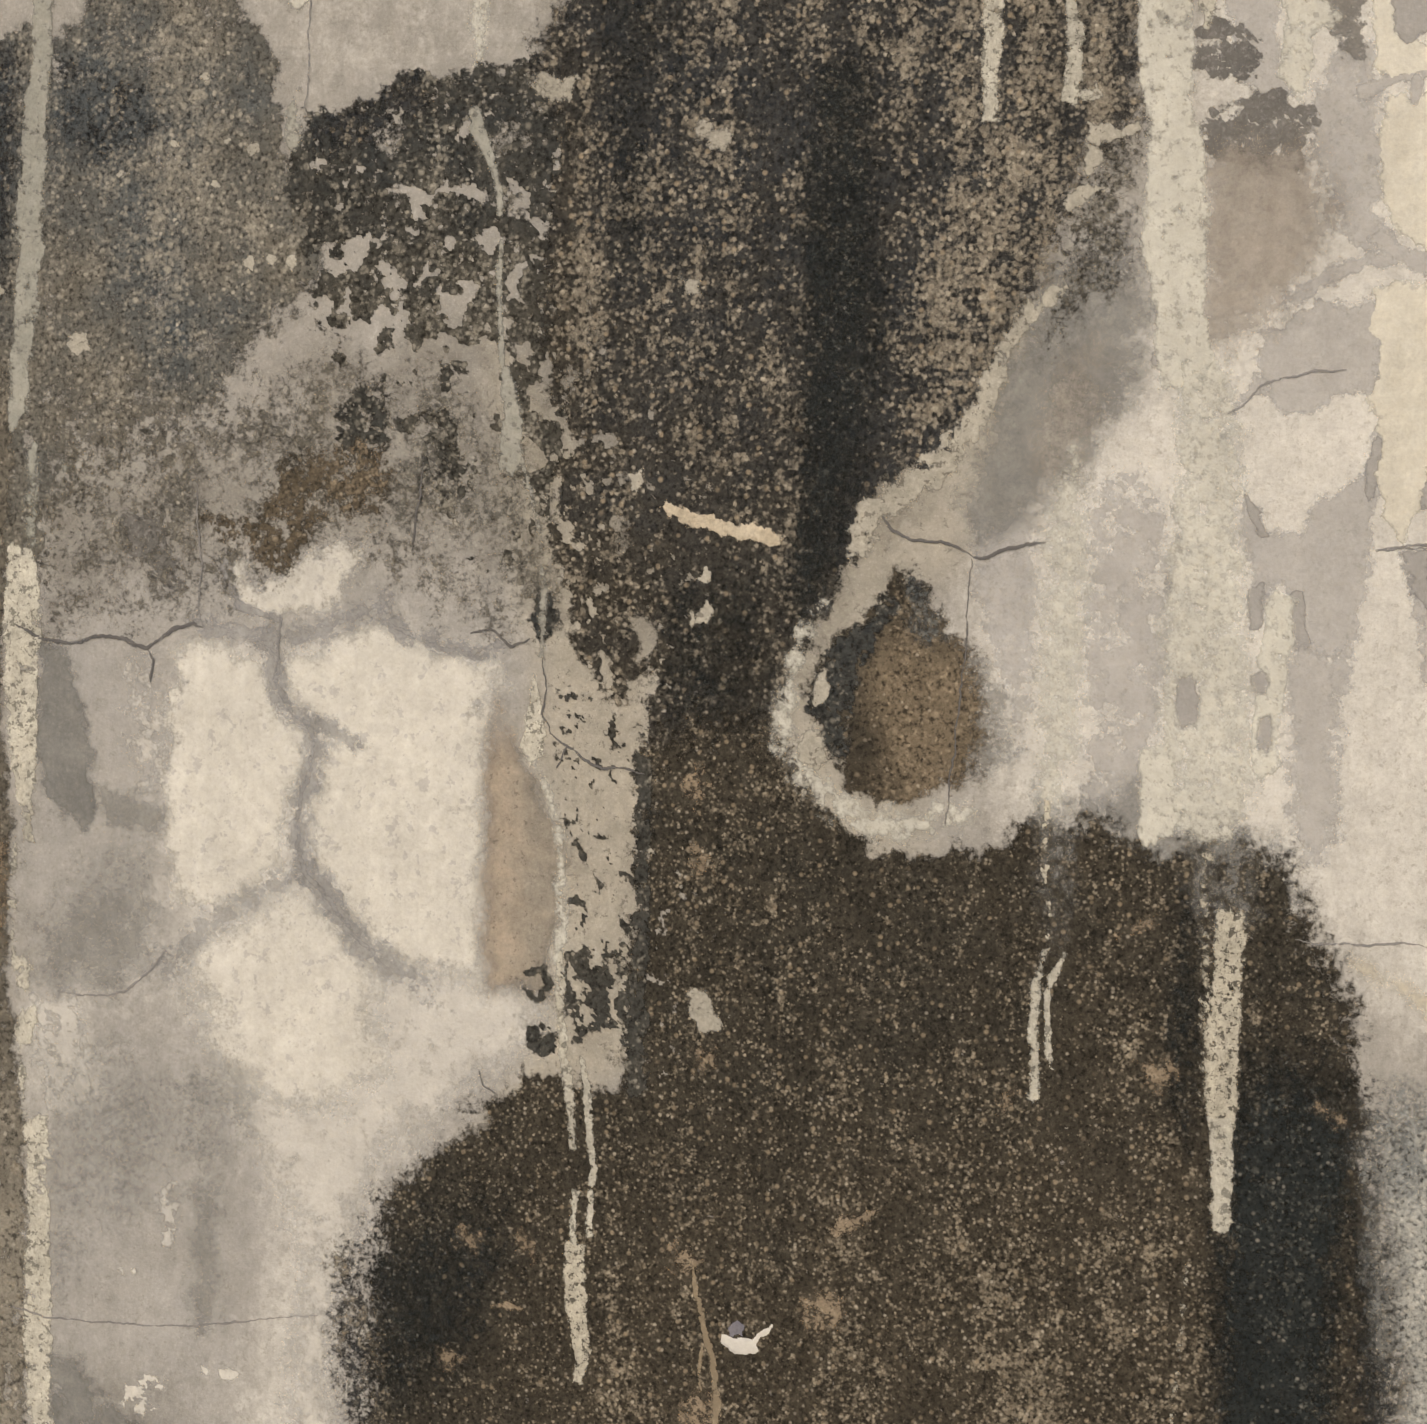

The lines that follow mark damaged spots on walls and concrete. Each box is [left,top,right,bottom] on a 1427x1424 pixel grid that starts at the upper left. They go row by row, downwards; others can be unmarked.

peeling [1226,0,1294,95]
peeling [1391,0,1427,44]
peeling [1233,41,1427,415]
crack [15,473,644,996]
damp [604,713,626,753]
crack [882,516,1046,826]
peeling [1240,428,1383,863]
peeling [1399,550,1427,682]
damp [482,732,568,1003]
damp [526,1022,558,1057]
damp [560,944,621,1044]
damp [614,991,632,1031]